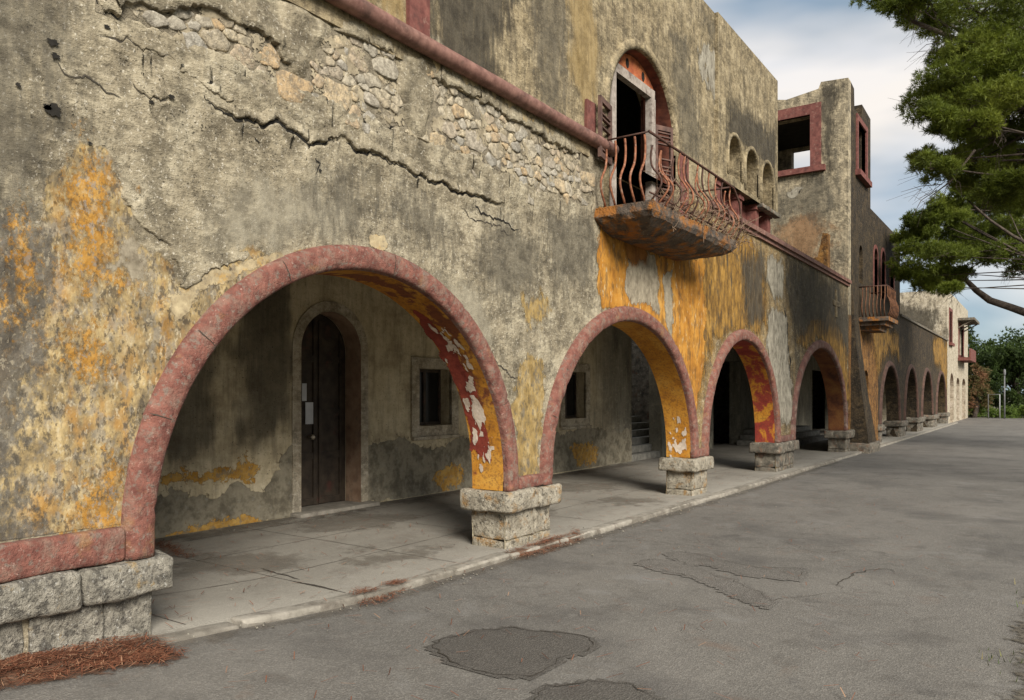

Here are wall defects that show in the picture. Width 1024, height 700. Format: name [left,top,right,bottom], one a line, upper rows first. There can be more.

spalling [43,103,61,117]
crack [56,0,598,235]
flaking render [95,0,601,208]
peeling [0,121,307,541]
peeling [368,310,494,502]
peeling [597,227,707,411]
peeling [668,417,687,457]